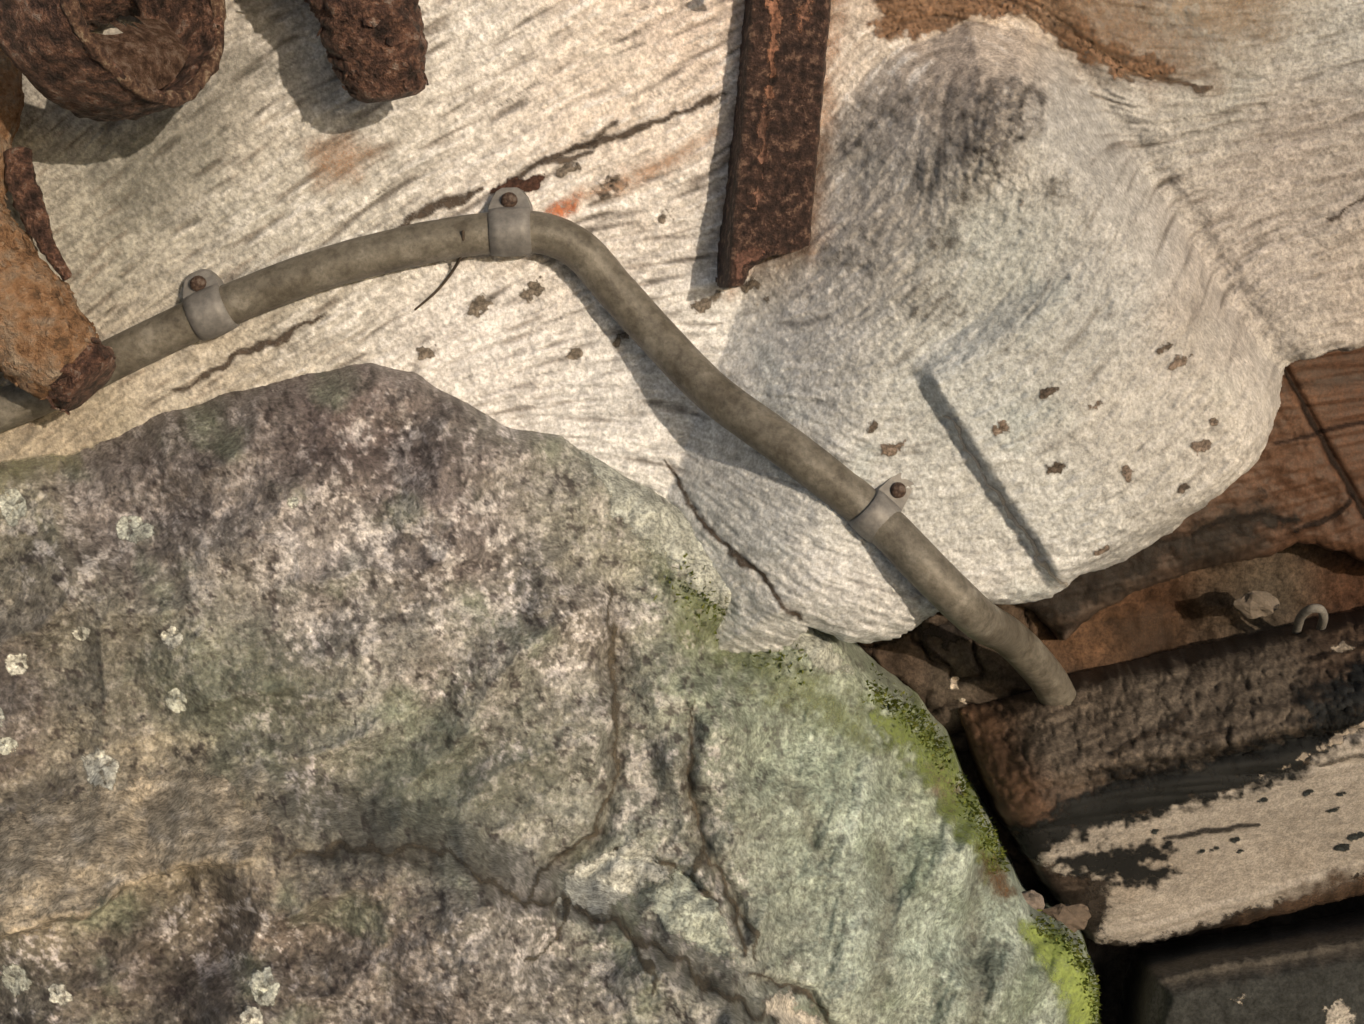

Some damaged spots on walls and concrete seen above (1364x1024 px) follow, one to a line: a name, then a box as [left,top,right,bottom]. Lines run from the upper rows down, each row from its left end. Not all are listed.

corrosion [331,0,410,47]
peeling [1331,641,1354,653]
peeling [1033,721,1364,947]